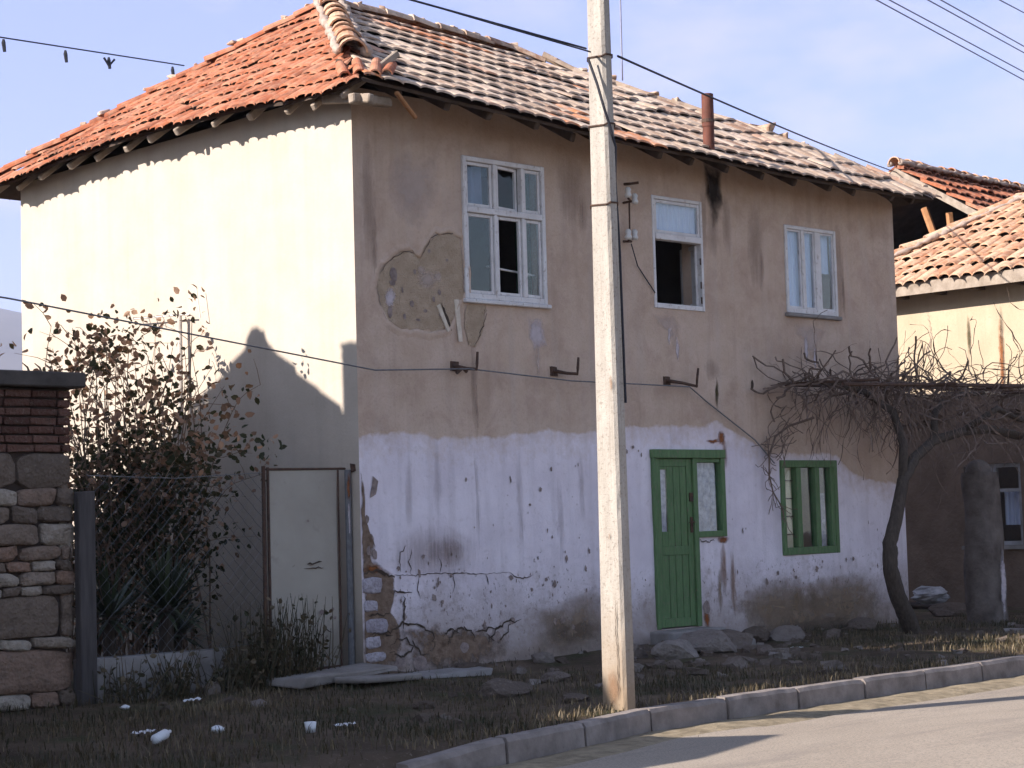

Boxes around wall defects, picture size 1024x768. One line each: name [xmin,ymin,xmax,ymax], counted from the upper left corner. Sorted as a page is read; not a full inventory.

peeling [369,226,487,347]
spalling [361,477,521,671]
crack [398,547,531,598]
rust [719,556,734,604]
damp [748,581,873,630]